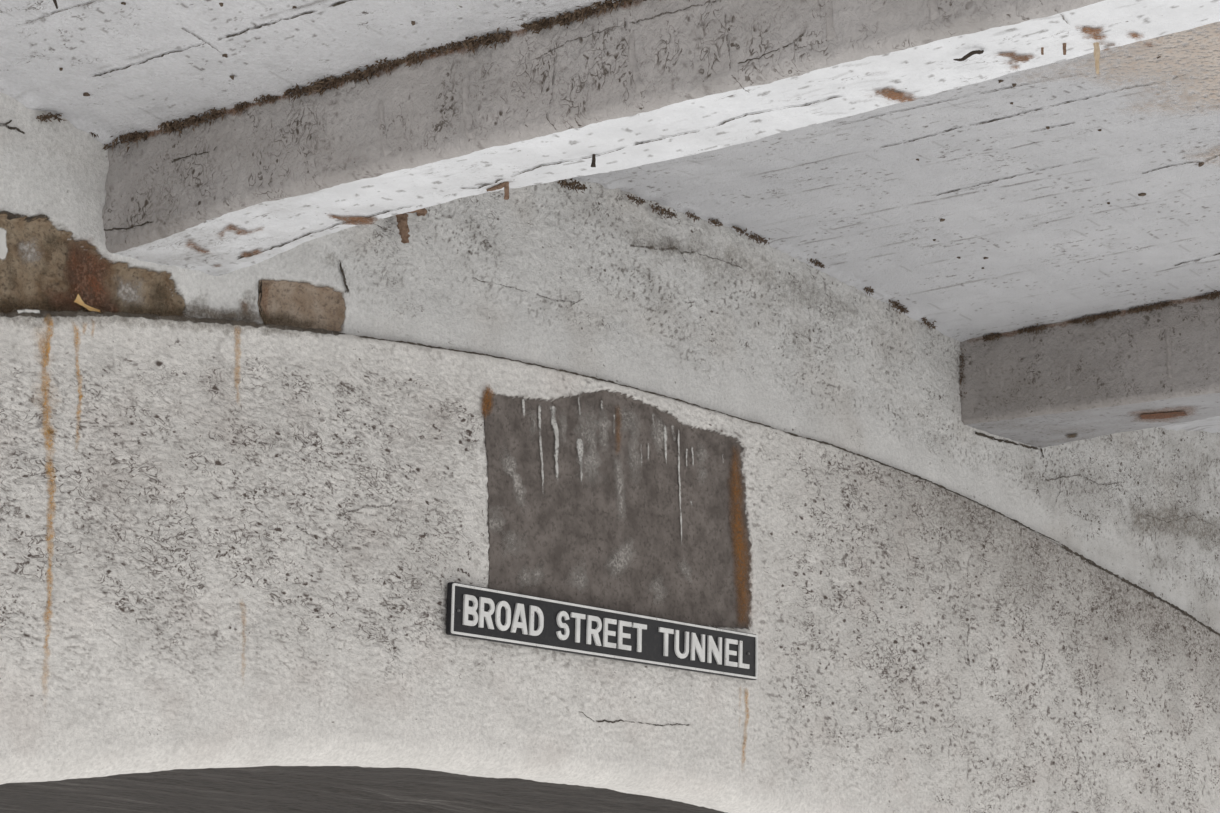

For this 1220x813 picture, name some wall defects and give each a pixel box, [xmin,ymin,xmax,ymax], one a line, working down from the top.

spalling [0,213,186,317]
spalling [257,280,346,331]
leakage [522,399,559,484]
leakage [652,415,694,541]
corrosion [1139,409,1190,422]
corrosion [46,464,54,620]
corrosion [730,452,750,621]
crack [582,712,689,726]